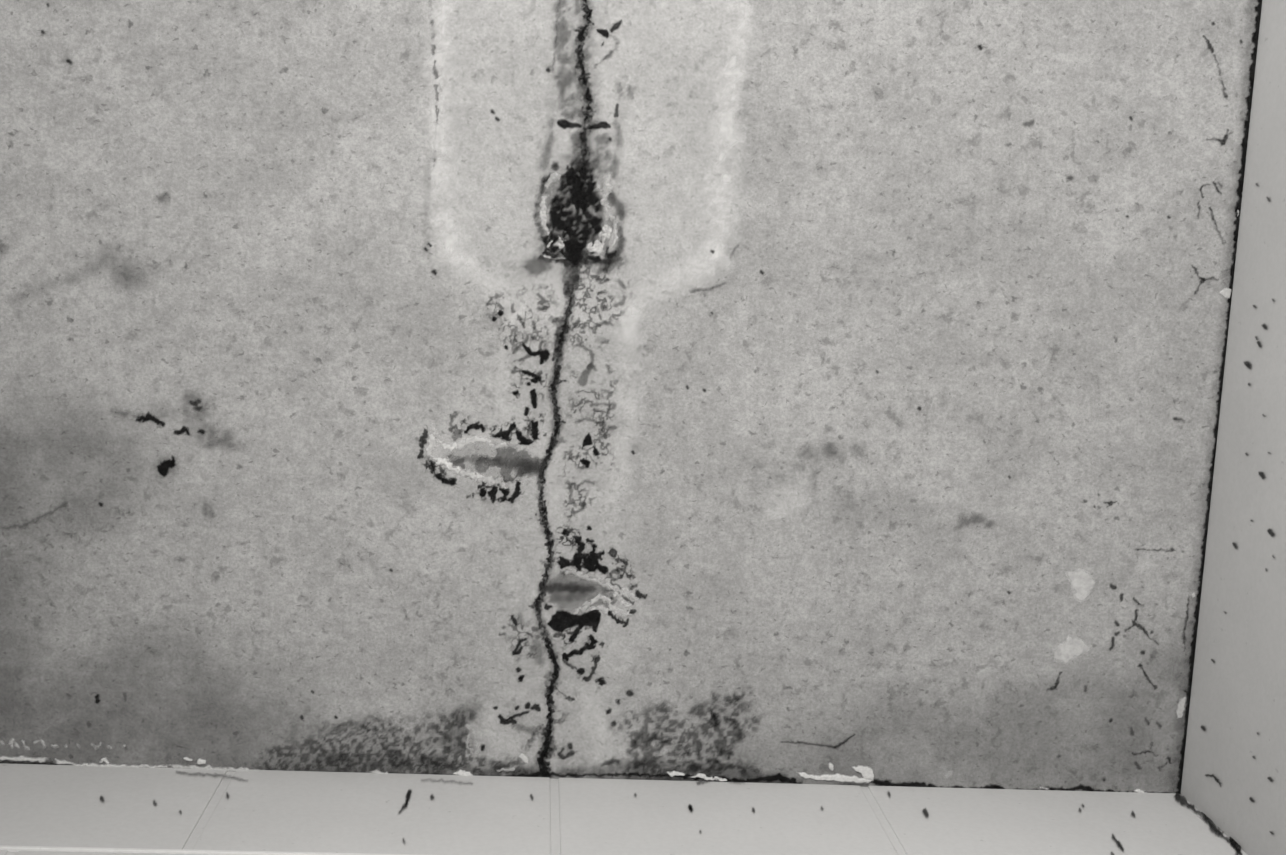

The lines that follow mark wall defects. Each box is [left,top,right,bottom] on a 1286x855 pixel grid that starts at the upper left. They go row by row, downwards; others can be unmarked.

crack [575,0,622,191]
damp [535,23,624,267]
damp [157,457,175,476]
damp [136,413,205,435]
spalling [417,415,546,503]
crack [510,251,802,784]
spalling [544,525,647,685]
damp [266,714,529,777]
damp [605,695,745,779]
peeling [798,763,874,785]